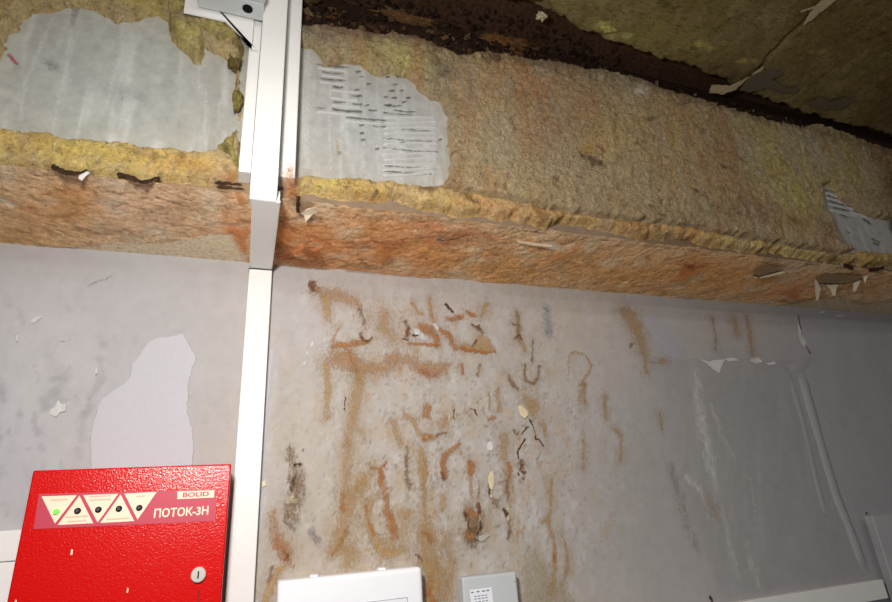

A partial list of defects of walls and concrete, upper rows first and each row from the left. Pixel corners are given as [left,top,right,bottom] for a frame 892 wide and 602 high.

peeling [50,400,66,417]
rust [274,220,331,268]
rust [308,281,450,444]
rust [402,298,496,354]
rust [509,311,540,417]
spalling [815,274,867,300]
rust [263,518,293,602]
rust [330,461,409,560]
rust [391,404,450,602]
rust [440,430,526,548]
rust [541,481,568,596]